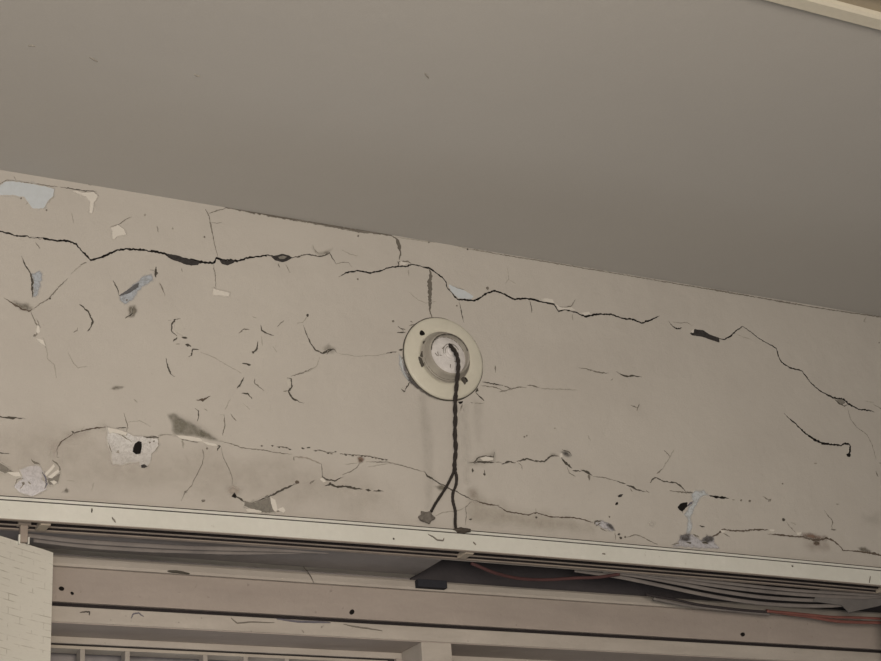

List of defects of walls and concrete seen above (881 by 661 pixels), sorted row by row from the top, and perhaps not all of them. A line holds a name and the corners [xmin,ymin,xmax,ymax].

peeling [0,177,99,214]
peeling [113,267,158,319]
crack [0,207,881,477]
spalling [106,414,167,468]
crack [166,314,593,526]
spalling [0,457,61,497]
crack [469,449,771,502]
spalling [672,491,719,548]
crack [712,510,881,556]